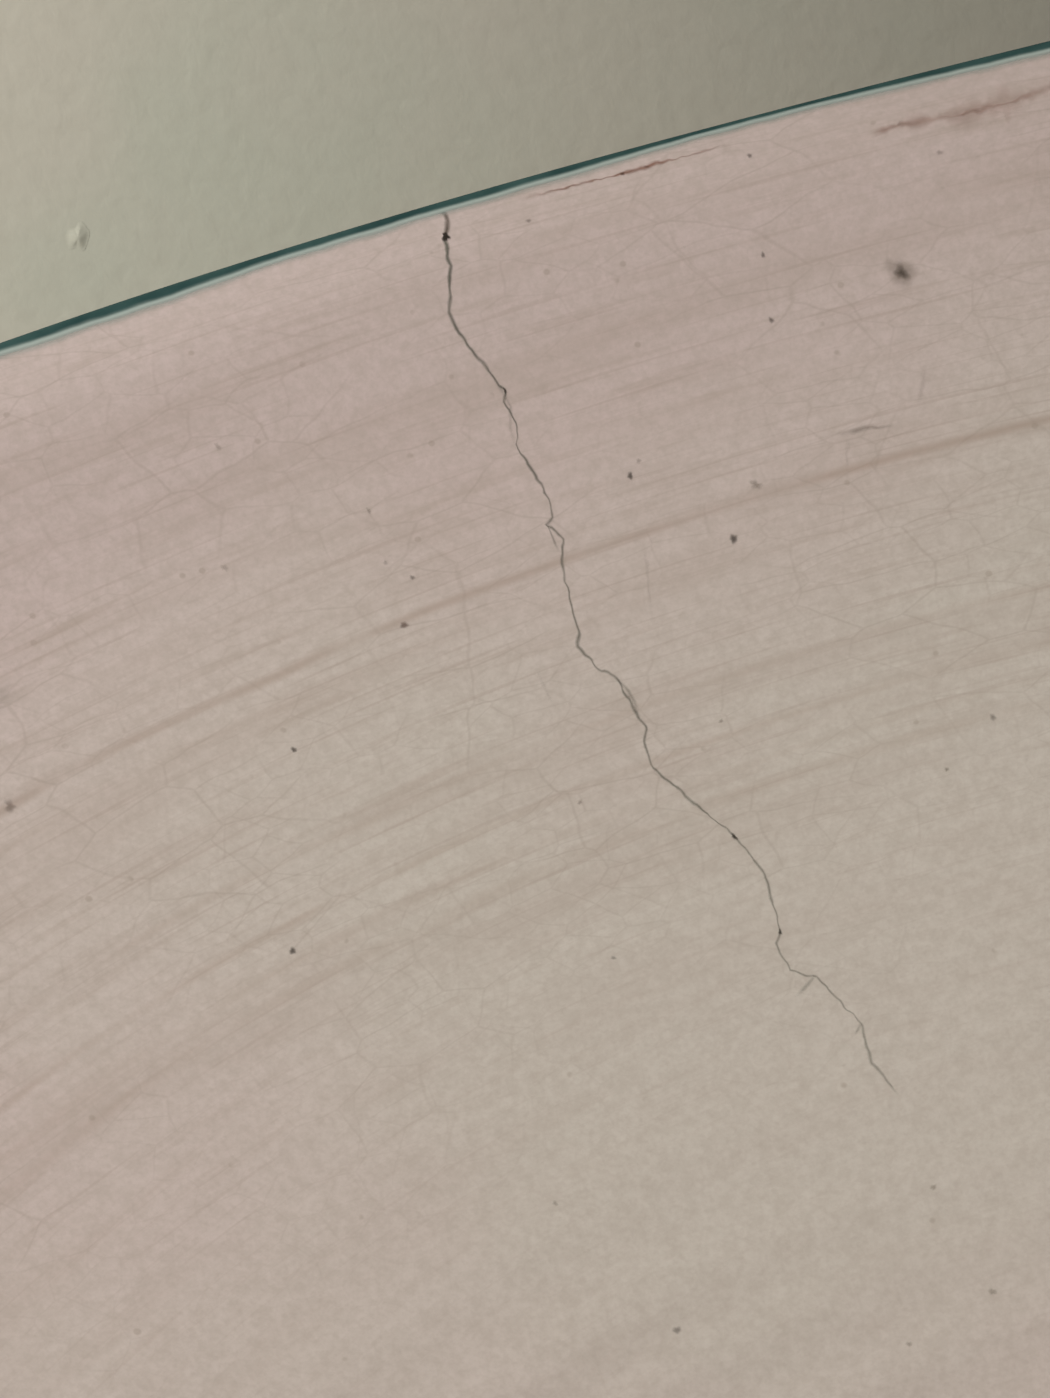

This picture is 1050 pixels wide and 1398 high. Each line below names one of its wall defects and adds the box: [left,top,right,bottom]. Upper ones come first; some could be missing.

crack [442,215,545,493]